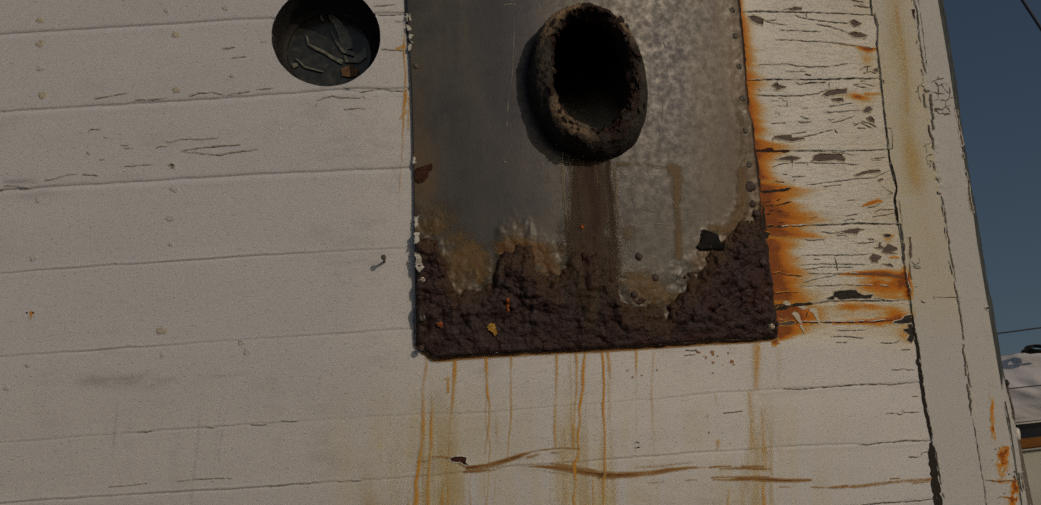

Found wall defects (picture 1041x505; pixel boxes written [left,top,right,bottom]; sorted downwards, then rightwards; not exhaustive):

peeling [748,14,765,27]
peeling [848,18,869,40]
peeling [821,87,848,103]
peeling [861,105,875,124]
peeling [772,133,846,164]
peeling [853,167,884,182]
rust [414,0,913,505]
peeling [835,226,913,267]
crack [738,0,1021,505]
rust [990,400,1019,505]